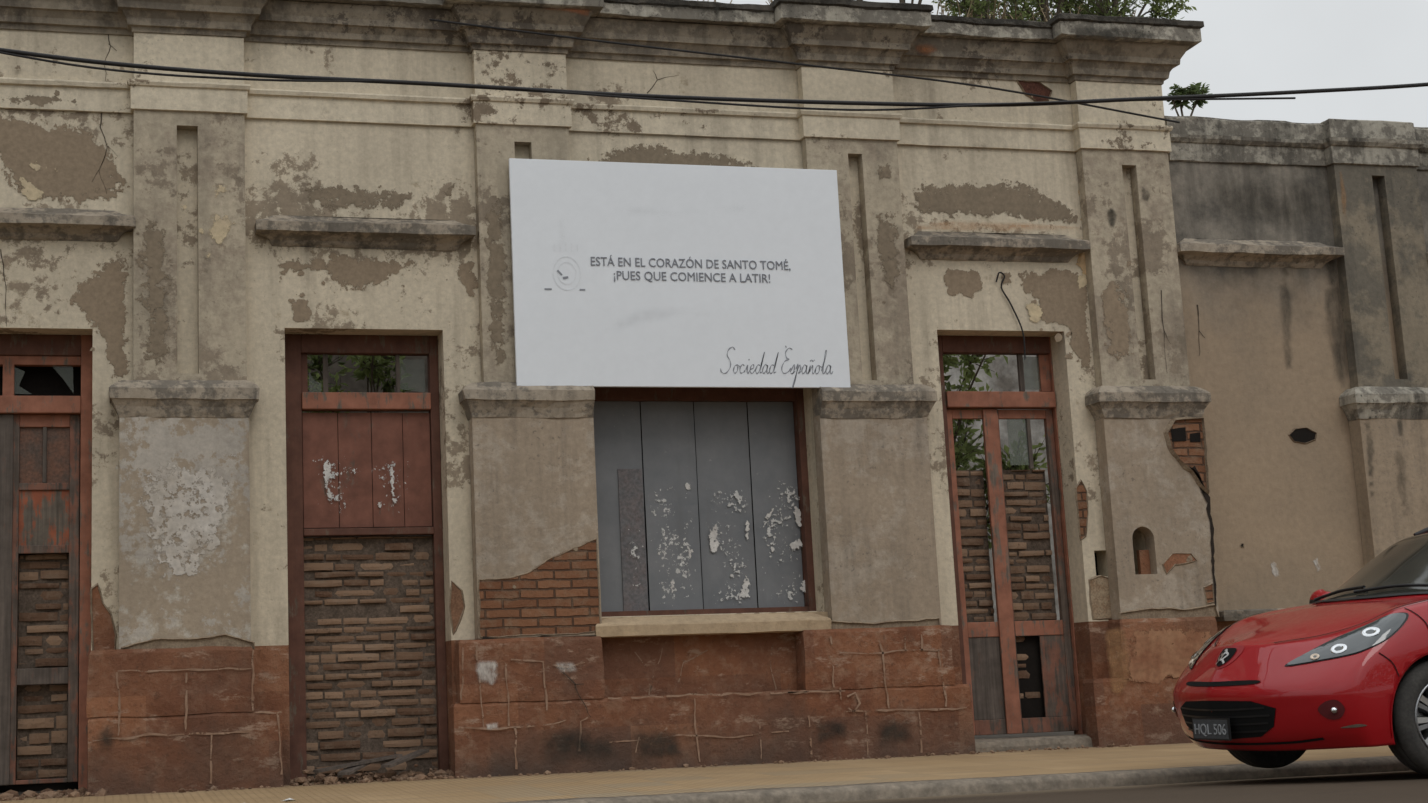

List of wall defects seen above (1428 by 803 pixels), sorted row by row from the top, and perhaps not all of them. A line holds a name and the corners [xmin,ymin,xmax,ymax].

peeling [0,90,129,206]
peeling [305,182,413,217]
peeling [914,179,1078,224]
peeling [57,218,172,378]
peeling [944,268,983,299]
peeling [1001,268,1135,368]
peeling [313,456,356,510]
peeling [374,462,408,508]
flaking render [1163,416,1210,494]
peeling [630,481,806,606]
flaking render [449,538,601,639]